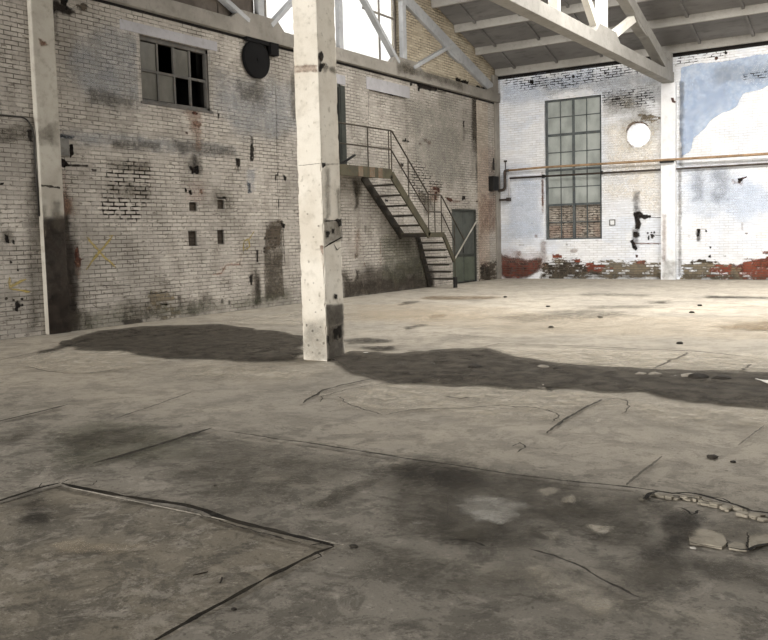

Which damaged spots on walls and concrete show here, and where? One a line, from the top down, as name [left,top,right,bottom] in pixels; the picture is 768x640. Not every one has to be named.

peeling [505,66,638,90]
peeling [603,88,654,108]
flaking render [60,135,151,223]
damp [48,203,88,335]
flaking render [479,253,661,281]
flaking render [680,246,768,280]
crack [303,378,630,433]
crack [0,428,768,640]